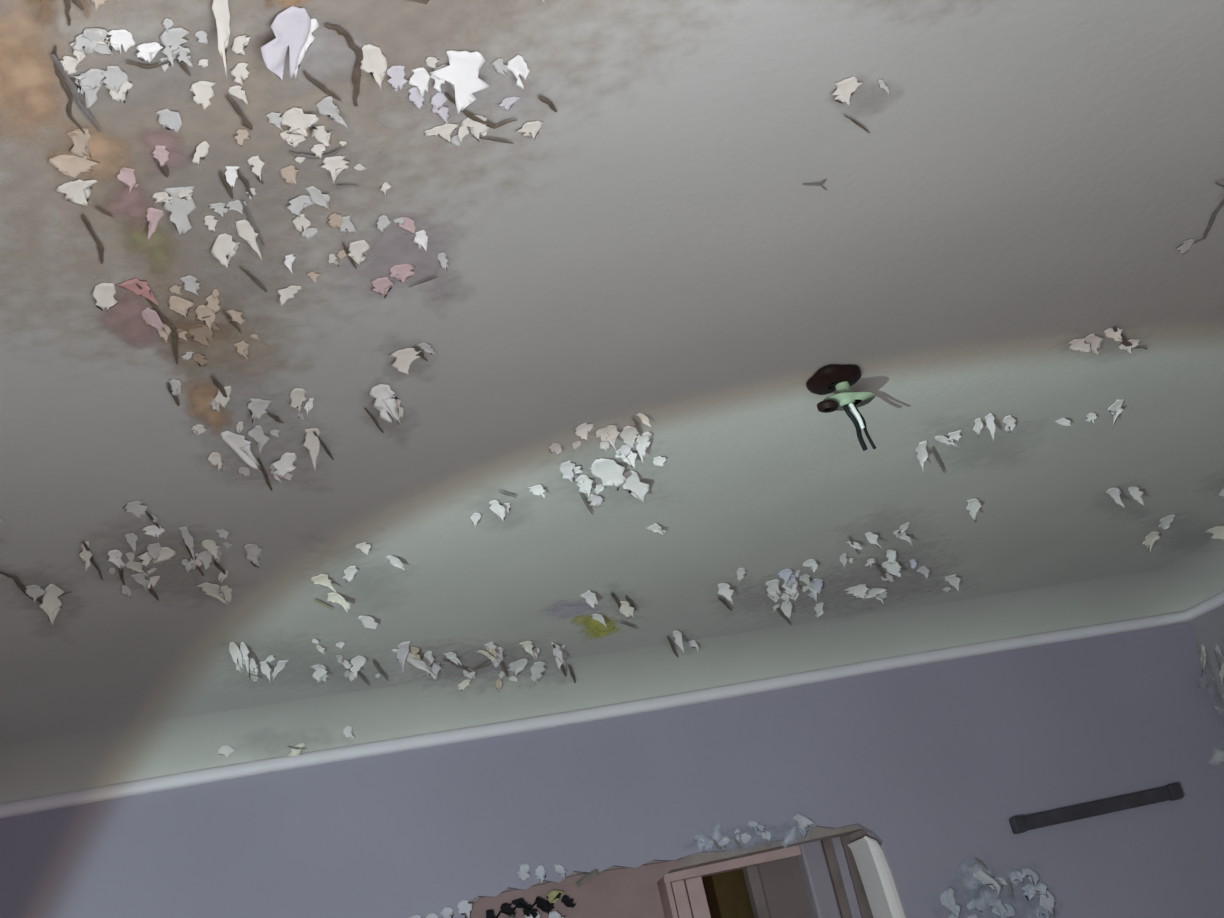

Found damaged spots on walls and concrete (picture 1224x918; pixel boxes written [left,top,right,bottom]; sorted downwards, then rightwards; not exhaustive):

leakage [0,0,456,381]
peeling [50,0,543,307]
crack [1192,182,1224,245]
peeling [152,275,334,491]
peeling [364,384,403,433]
peeling [548,413,667,515]
peeling [915,413,1017,473]
peeling [79,500,263,607]
peeling [757,522,930,625]
peeling [229,642,289,683]
peeling [392,641,576,692]
flaking render [409,859,683,918]